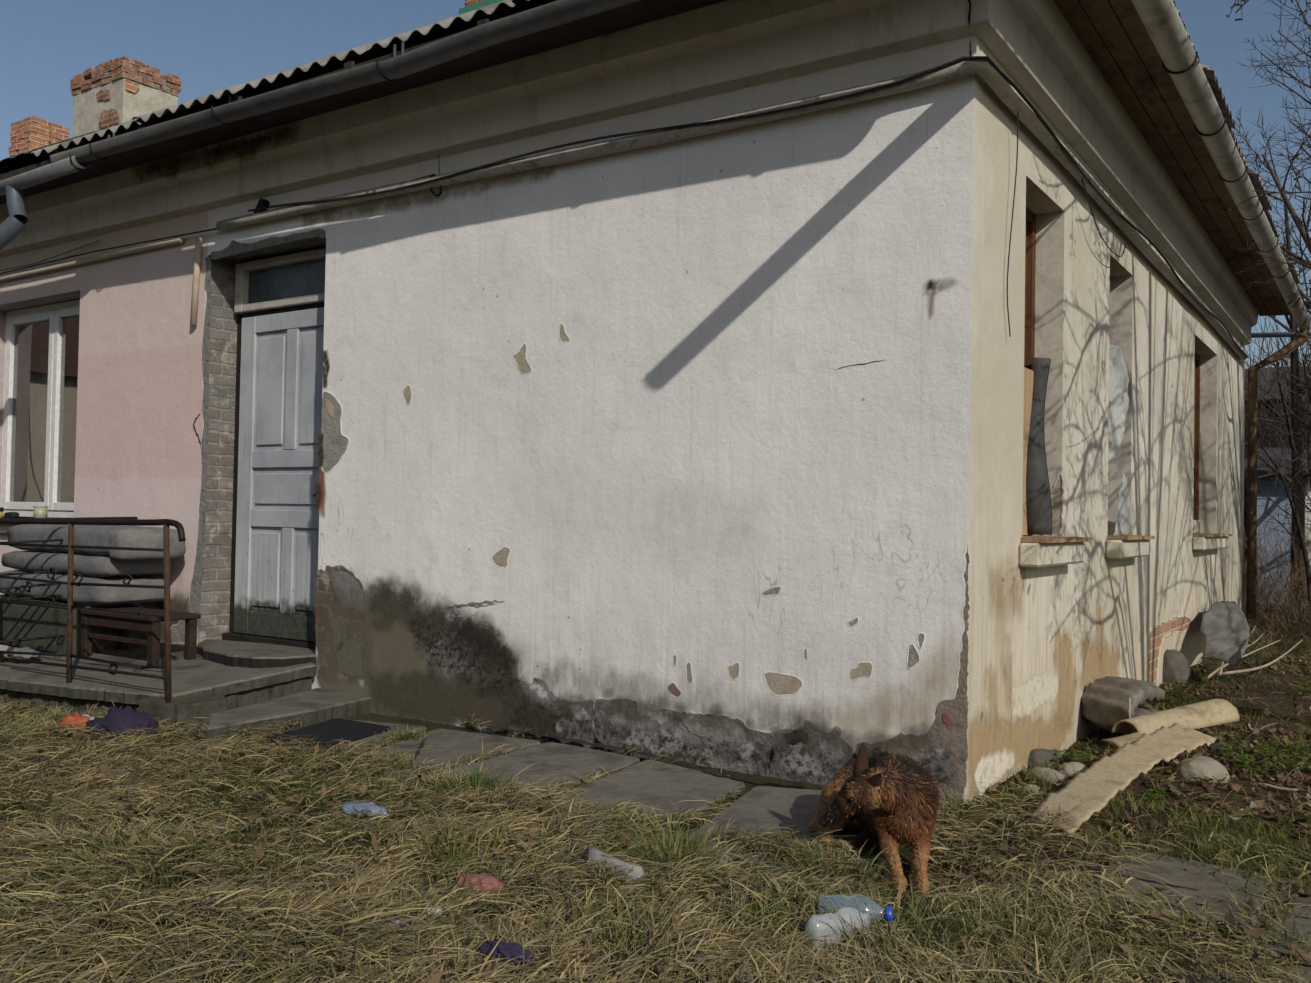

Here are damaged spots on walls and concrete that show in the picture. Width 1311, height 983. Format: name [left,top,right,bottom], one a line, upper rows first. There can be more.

crack [965,0,973,56]
peeling [512,343,532,376]
peeling [558,322,570,343]
spalling [321,391,350,474]
peeling [492,546,511,569]
spalling [314,563,366,664]
water stain [316,581,876,783]
spalling [508,544,1014,807]
water stain [969,609,1119,795]